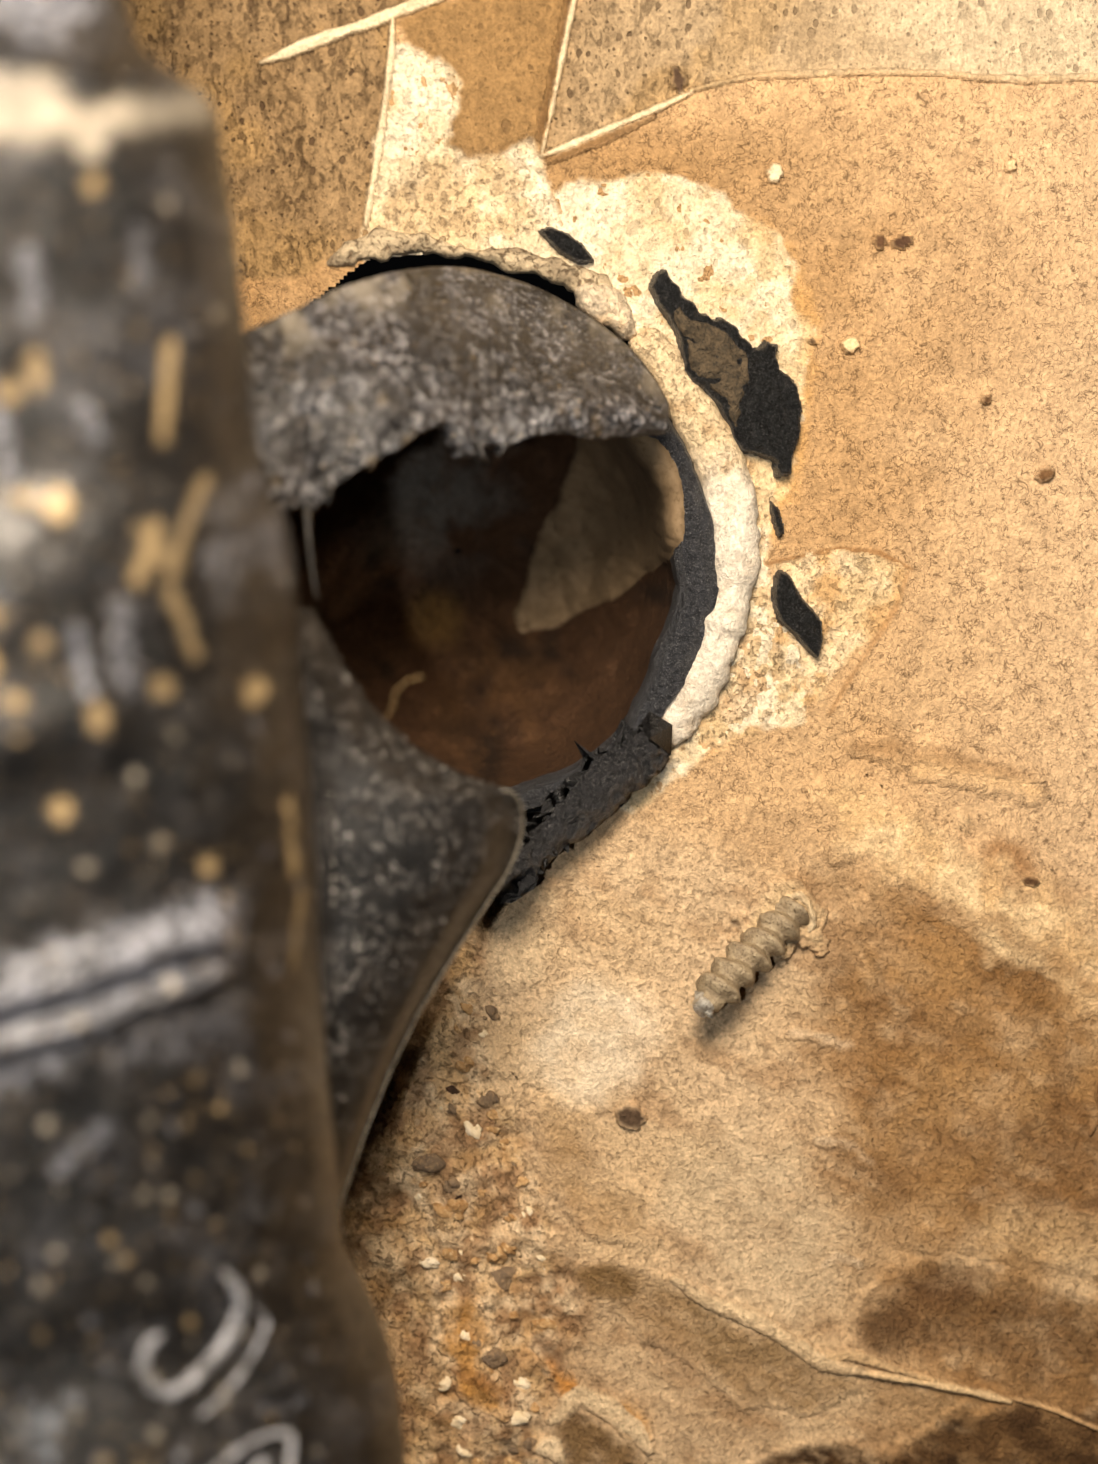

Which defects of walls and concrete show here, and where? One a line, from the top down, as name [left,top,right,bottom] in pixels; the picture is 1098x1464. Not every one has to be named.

crack [257,0,446,230]
crack [534,0,693,166]
spalling [358,39,916,818]
water stain [481,730,1098,1464]
crack [668,1271,1098,1431]